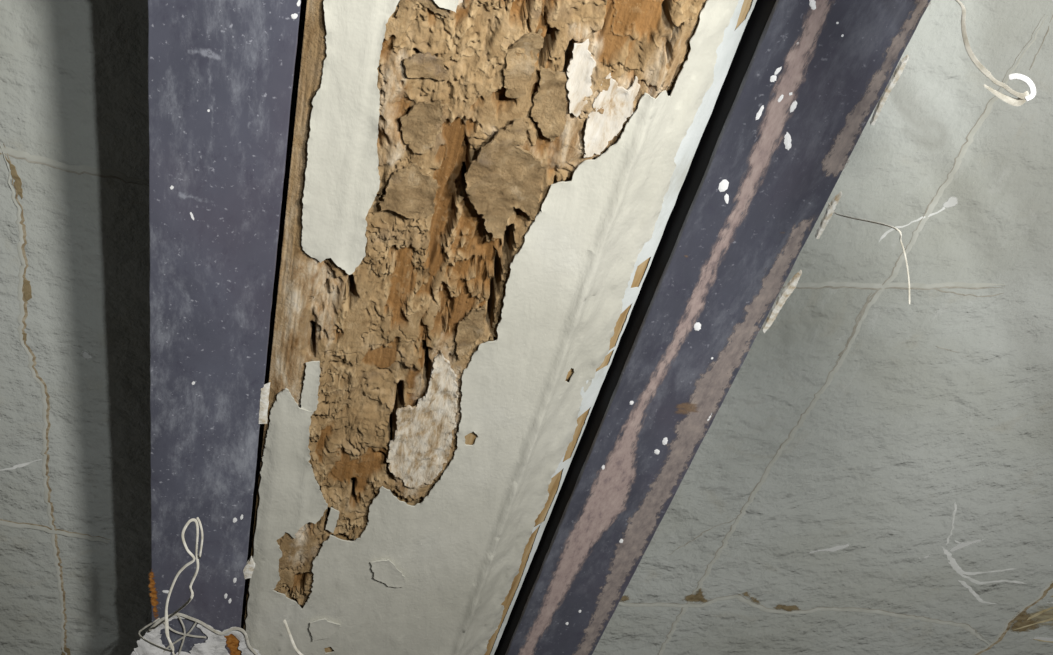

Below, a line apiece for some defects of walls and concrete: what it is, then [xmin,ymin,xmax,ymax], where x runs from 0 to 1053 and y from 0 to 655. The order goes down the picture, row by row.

peeling [396,0,449,18]
peeling [379,163,438,221]
peeling [455,305,486,361]
crack [618,14,1053,655]
crack [0,144,110,655]
peeling [259,382,270,424]
peeling [465,432,478,445]
peeling [484,408,590,655]
peeling [243,556,255,579]